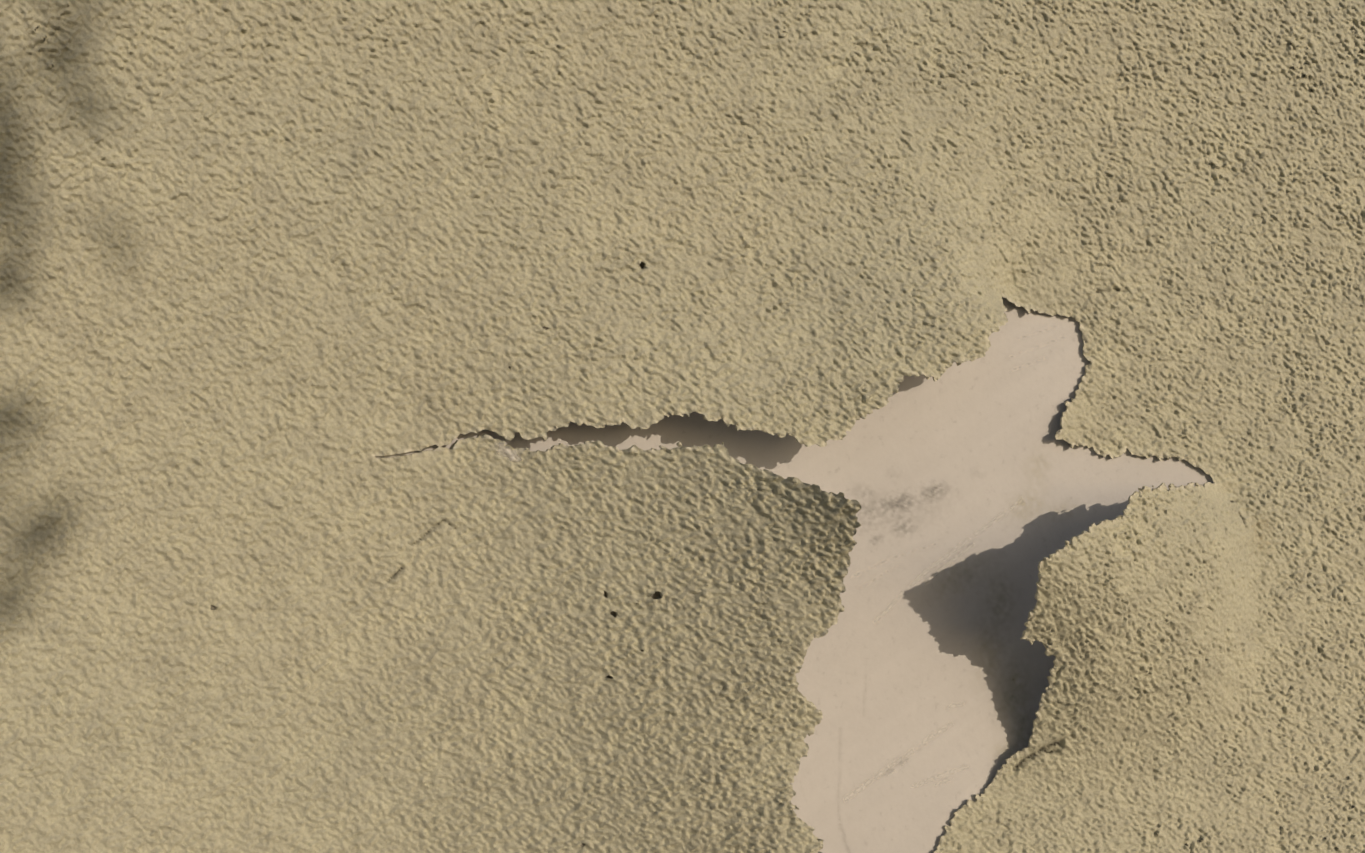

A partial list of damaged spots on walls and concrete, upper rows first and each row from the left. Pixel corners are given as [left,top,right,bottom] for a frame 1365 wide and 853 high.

crack [375,411,795,479]
flaking render [355,27,1254,853]